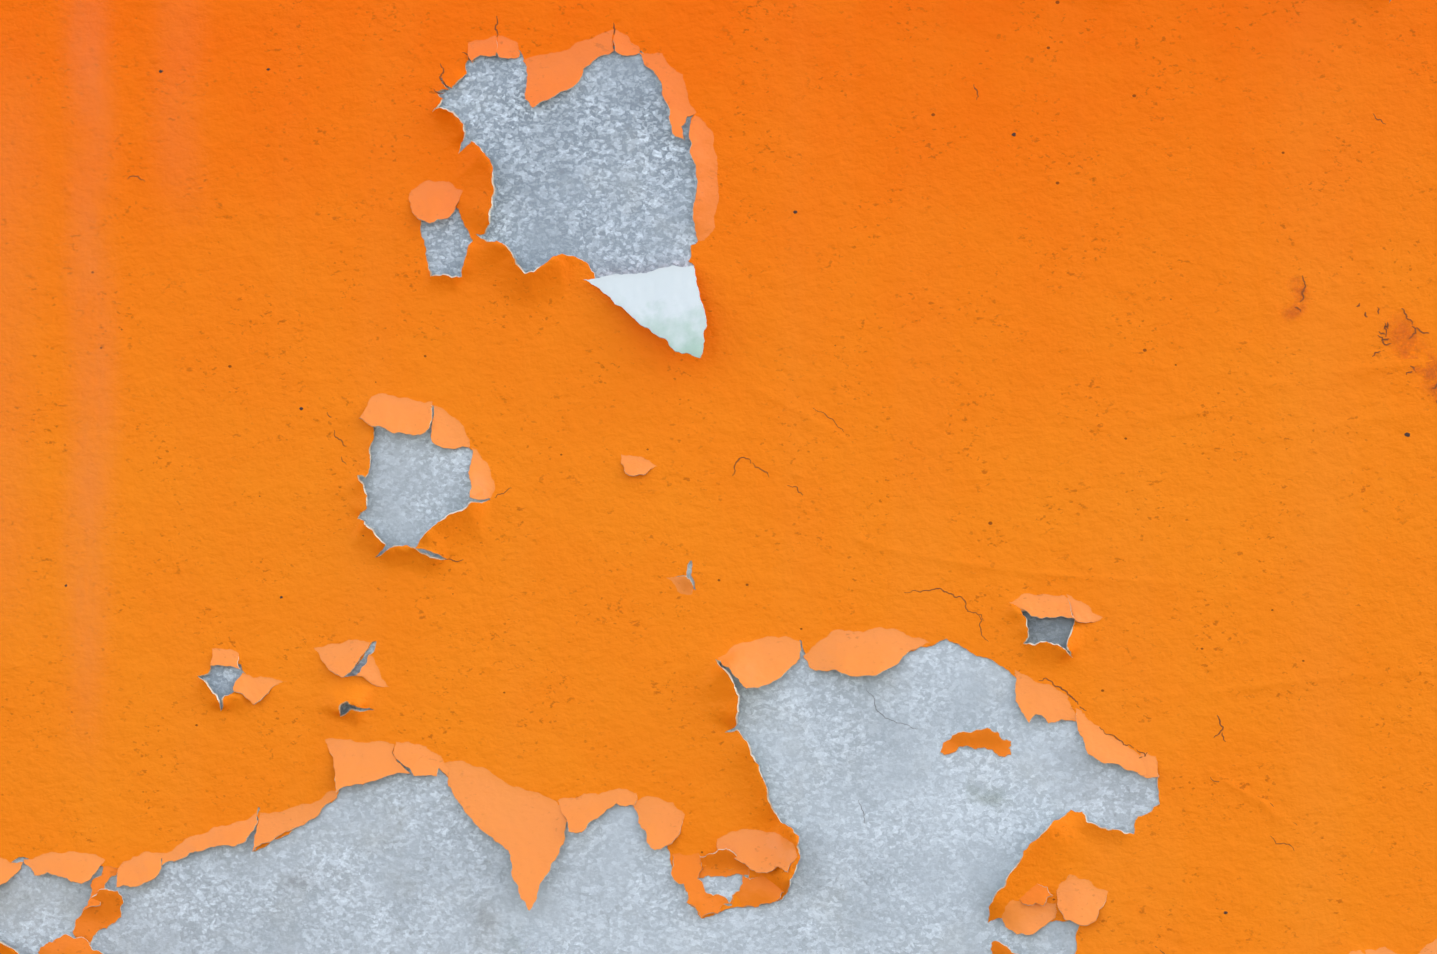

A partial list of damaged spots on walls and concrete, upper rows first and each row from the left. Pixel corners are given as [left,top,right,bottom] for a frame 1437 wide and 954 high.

peeling [409,30,719,358]
peeling [359,393,495,559]
peeling [621,455,656,476]
peeling [1009,593,1103,654]
peeling [0,627,1159,954]
peeling [1419,939,1437,954]